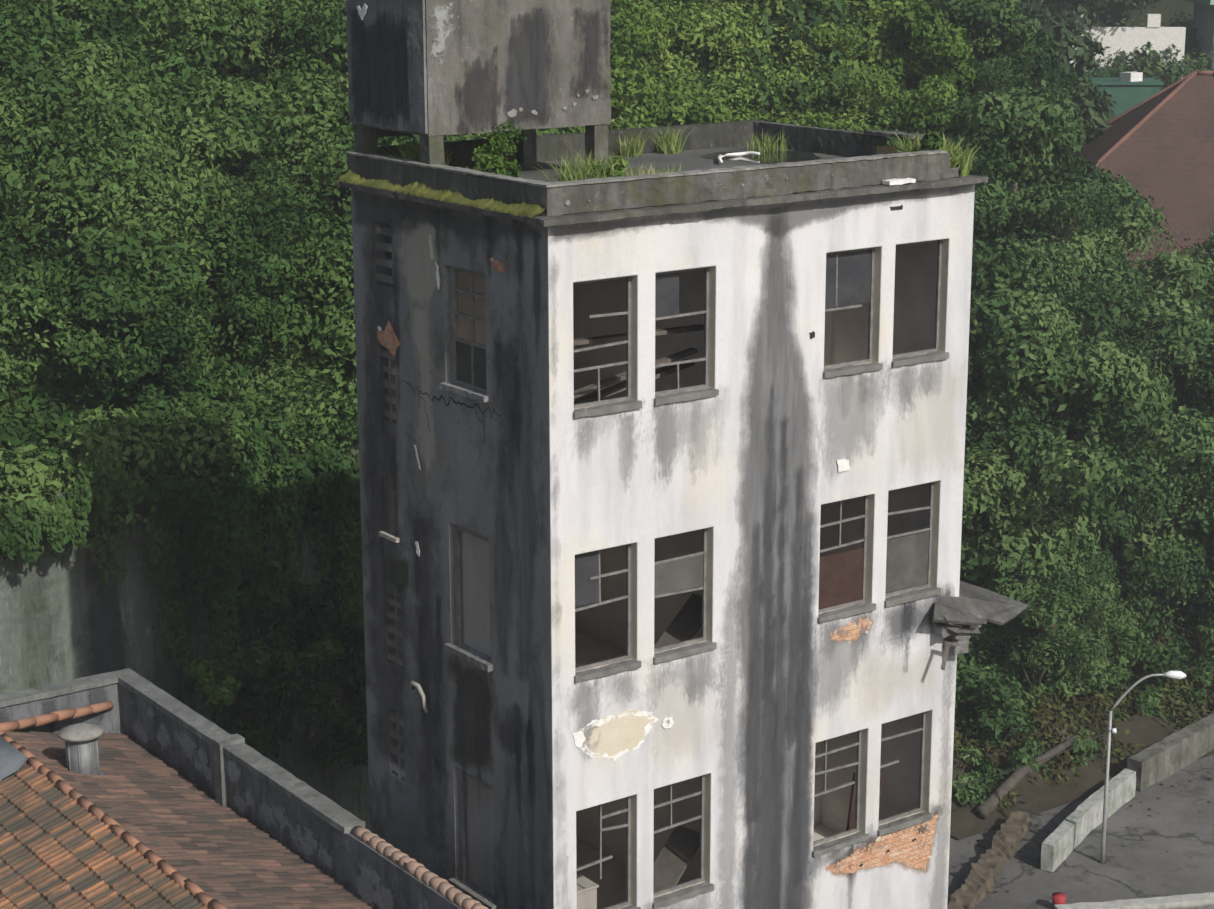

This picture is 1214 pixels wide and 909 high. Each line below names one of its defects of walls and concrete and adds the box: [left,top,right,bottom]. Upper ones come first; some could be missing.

damp [349,9,413,126]
damp [455,8,552,134]
damp [569,9,609,97]
peeling [377,216,440,479]
crack [400,379,503,438]
damp [50,522,153,719]
damp [494,228,550,909]
damp [738,213,816,909]
spalling [830,617,872,643]
damp [419,597,492,832]
peeling [573,709,674,761]
spalling [826,814,938,876]